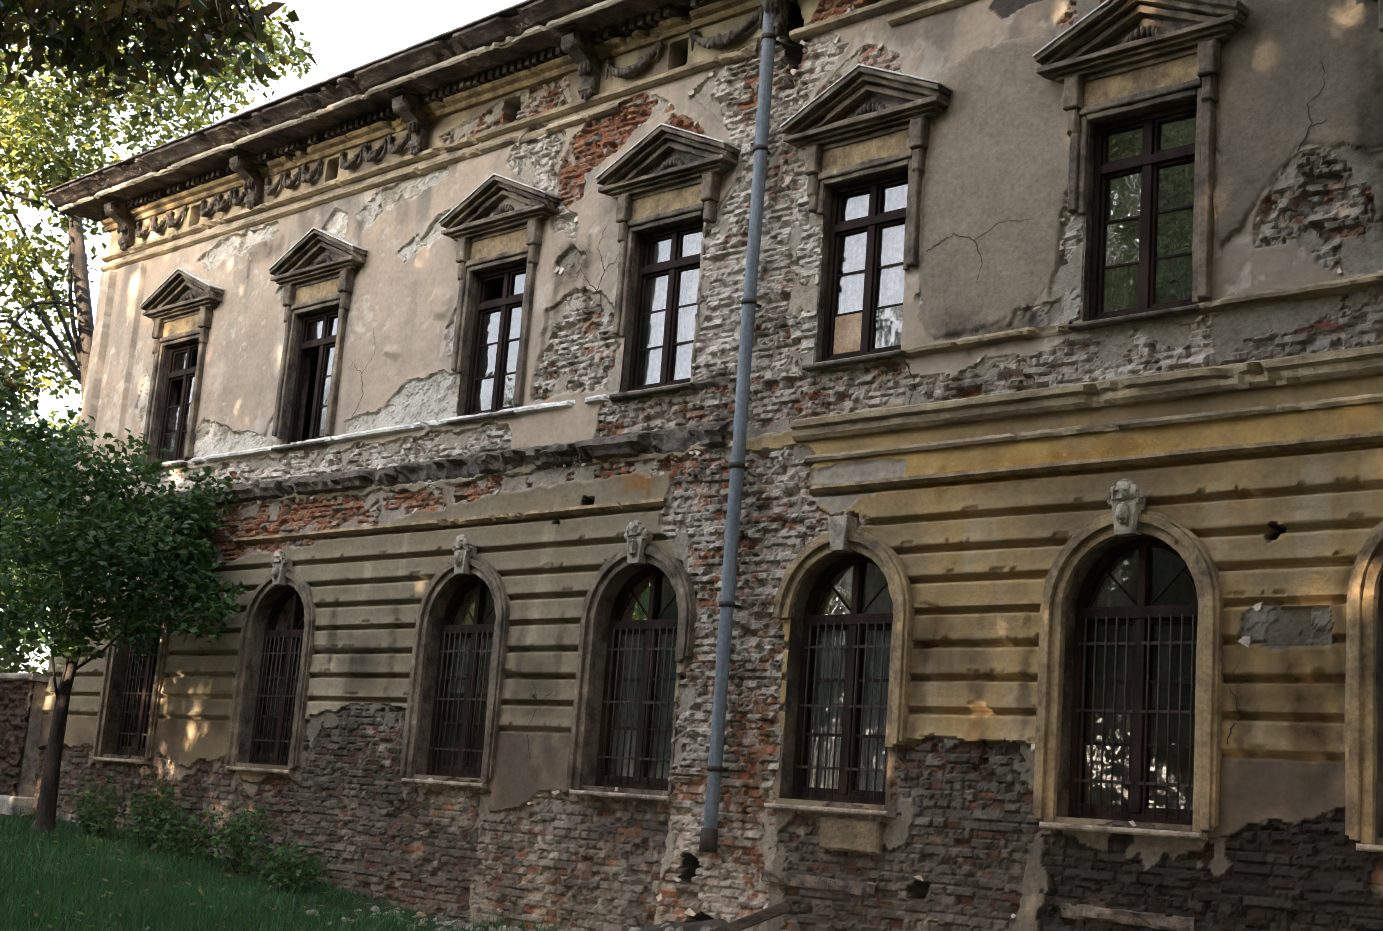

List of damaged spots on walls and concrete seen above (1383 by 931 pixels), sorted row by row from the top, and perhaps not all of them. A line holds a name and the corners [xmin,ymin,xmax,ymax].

spalling [439,75,572,144]
crack [1297,62,1327,151]
spalling [197,219,279,271]
spalling [323,166,450,251]
spalling [397,207,453,263]
spalling [507,91,707,403]
spalling [594,36,762,440]
crack [926,219,1029,283]
spalling [746,0,1383,440]
spalling [115,308,512,499]
spalling [56,441,1383,931]
spalling [32,745,47,815]